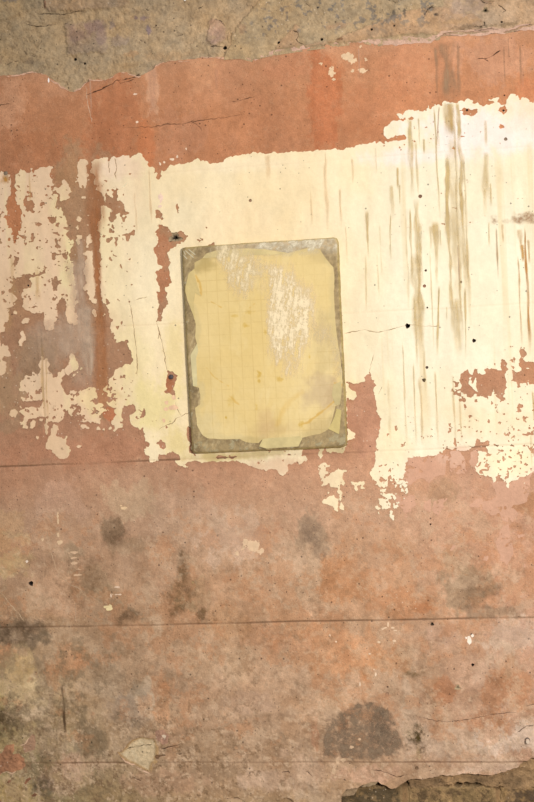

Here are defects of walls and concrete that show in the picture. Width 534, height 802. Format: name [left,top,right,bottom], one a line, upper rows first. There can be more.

flaking render [0,0,534,92]
damp [434,105,461,135]
damp [433,163,449,243]
peeling [154,210,215,322]
peeling [0,158,146,461]
peeling [164,370,178,395]
peeling [345,372,381,449]
peeling [451,346,534,452]
flaking render [0,734,36,783]
flaking render [117,730,169,774]
damp [324,703,422,759]